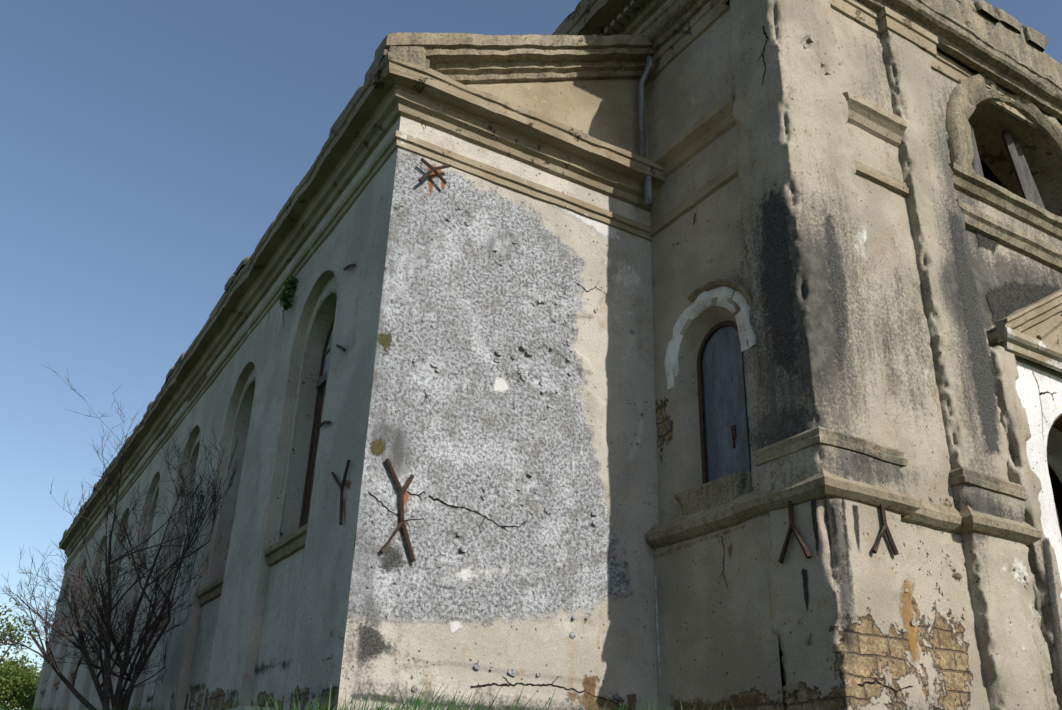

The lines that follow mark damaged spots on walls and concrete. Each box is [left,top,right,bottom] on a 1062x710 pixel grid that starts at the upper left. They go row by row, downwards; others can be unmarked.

crack [758,25,768,86]
rust [426,165,445,194]
damp [758,182,800,374]
damp [822,209,848,371]
spalling [493,344,533,382]
crack [368,491,527,534]
crack [471,675,624,707]